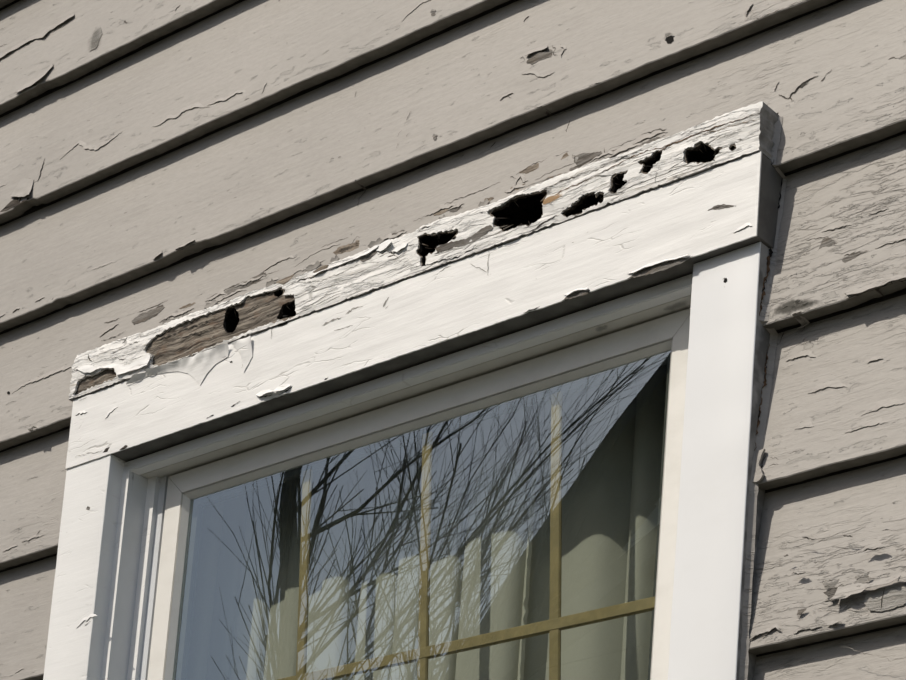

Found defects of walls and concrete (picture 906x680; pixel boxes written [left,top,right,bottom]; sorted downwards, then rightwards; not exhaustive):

peeling [521,44,567,78]
spalling [16,64,53,93]
peeling [505,128,667,193]
peeling [0,159,45,212]
peeling [416,203,464,230]
peeling [75,355,151,375]
peeling [822,572,906,612]